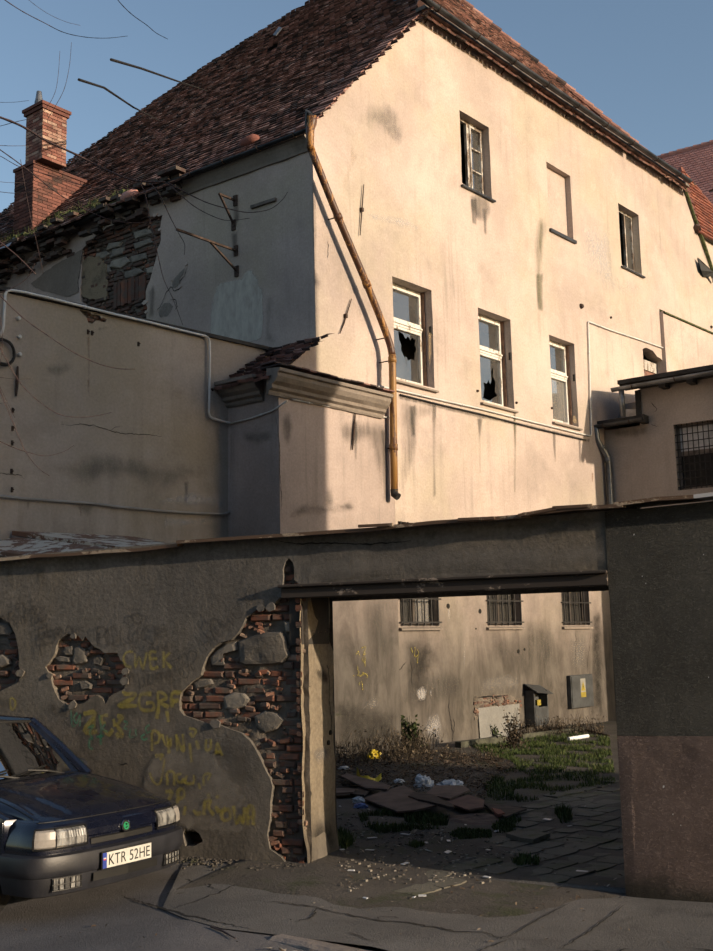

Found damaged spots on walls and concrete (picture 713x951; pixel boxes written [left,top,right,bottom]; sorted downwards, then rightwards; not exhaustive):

flaking render [81,212,173,324]
crack [61,424,162,437]
spalling [0,617,25,691]
spalling [46,633,130,710]
spalling [181,560,312,863]